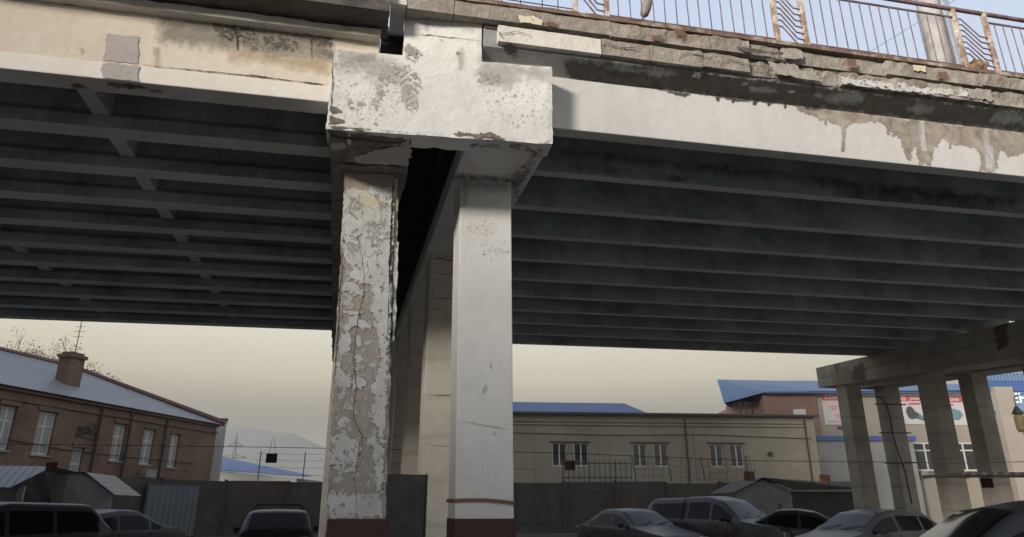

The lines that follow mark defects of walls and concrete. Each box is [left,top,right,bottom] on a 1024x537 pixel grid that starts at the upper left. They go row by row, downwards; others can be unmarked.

damp [154,20,333,70]
spalling [737,46,820,81]
spalling [841,77,993,102]
spalling [454,131,504,140]
damp [565,59,1024,172]
peeling [326,43,422,519]
crack [334,183,394,510]